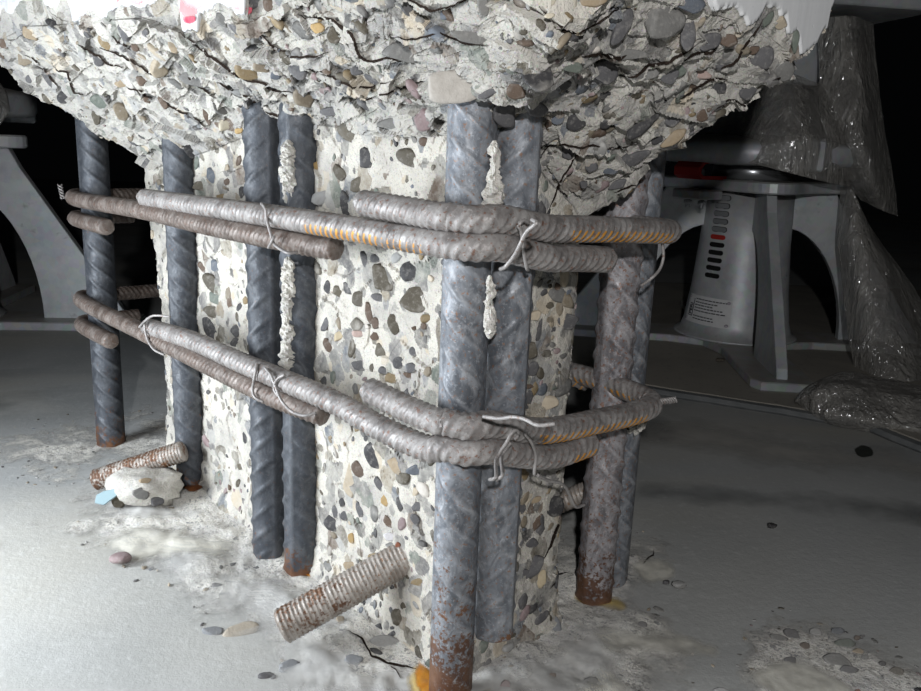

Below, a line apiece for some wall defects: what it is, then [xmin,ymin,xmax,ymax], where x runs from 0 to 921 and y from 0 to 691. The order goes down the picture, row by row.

crack [25,55,81,95]
crack [78,32,292,127]
crack [261,0,489,101]
spalling [0,0,814,220]
crack [582,20,763,113]
spalling [150,221,170,324]
spalling [195,233,249,354]
spalling [313,240,443,435]
spalling [199,372,253,530]
spalling [308,415,436,667]
crack [348,630,417,678]
corrosion [410,664,429,691]